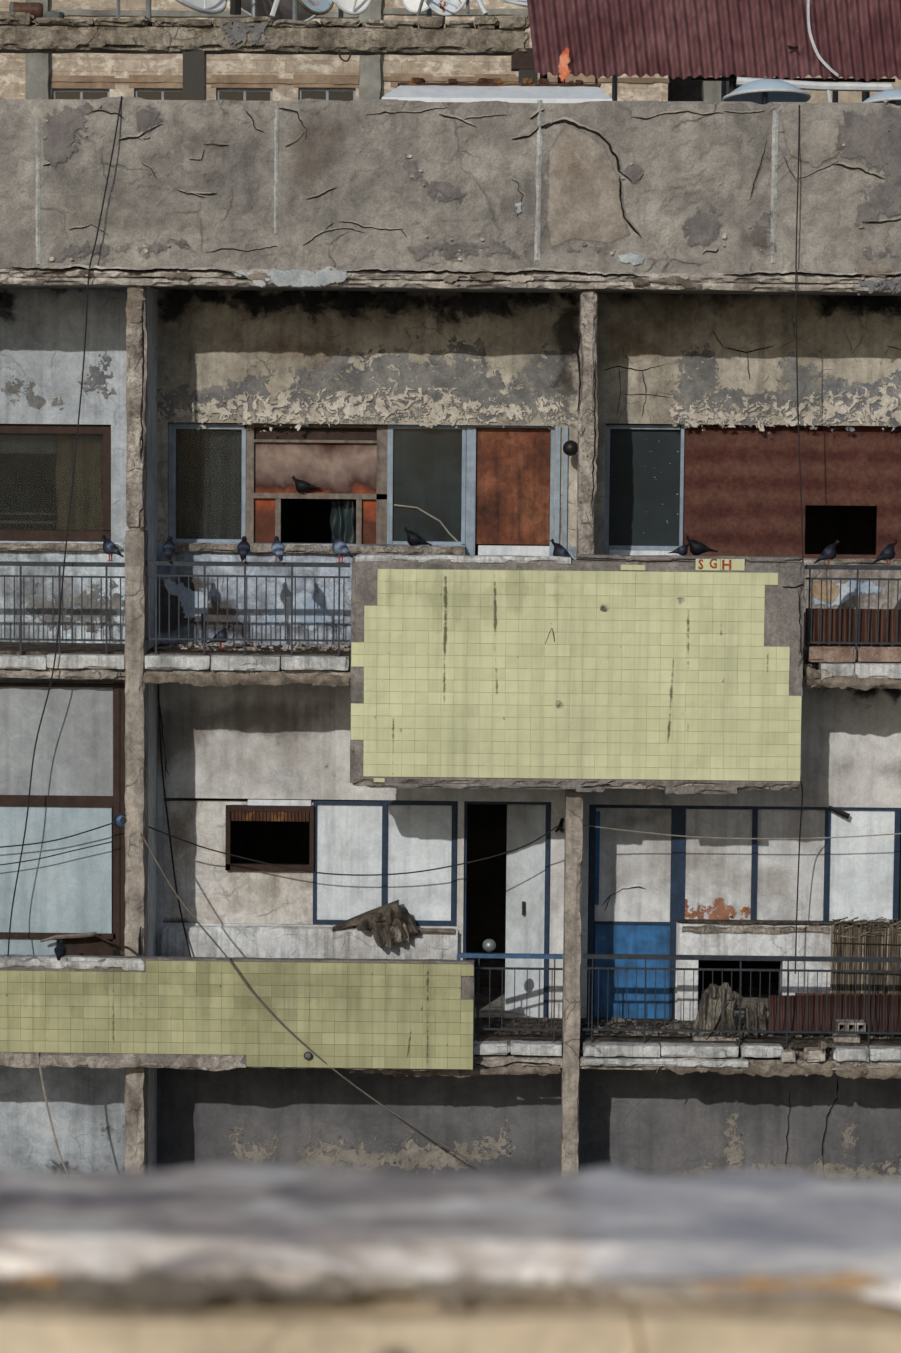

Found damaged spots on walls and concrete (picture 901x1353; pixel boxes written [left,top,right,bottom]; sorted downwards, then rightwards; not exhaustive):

crack [90,105,309,198]
crack [367,107,644,237]
crack [636,109,884,198]
crack [341,267,649,277]
crack [702,248,901,278]
crack [862,216,901,224]
crack [5,187,406,461]
peeling [157,335,578,431]
peeling [667,343,901,434]
corrosion [684,898,751,920]
spalling [663,1038,901,1080]
crack [785,1064,899,1171]